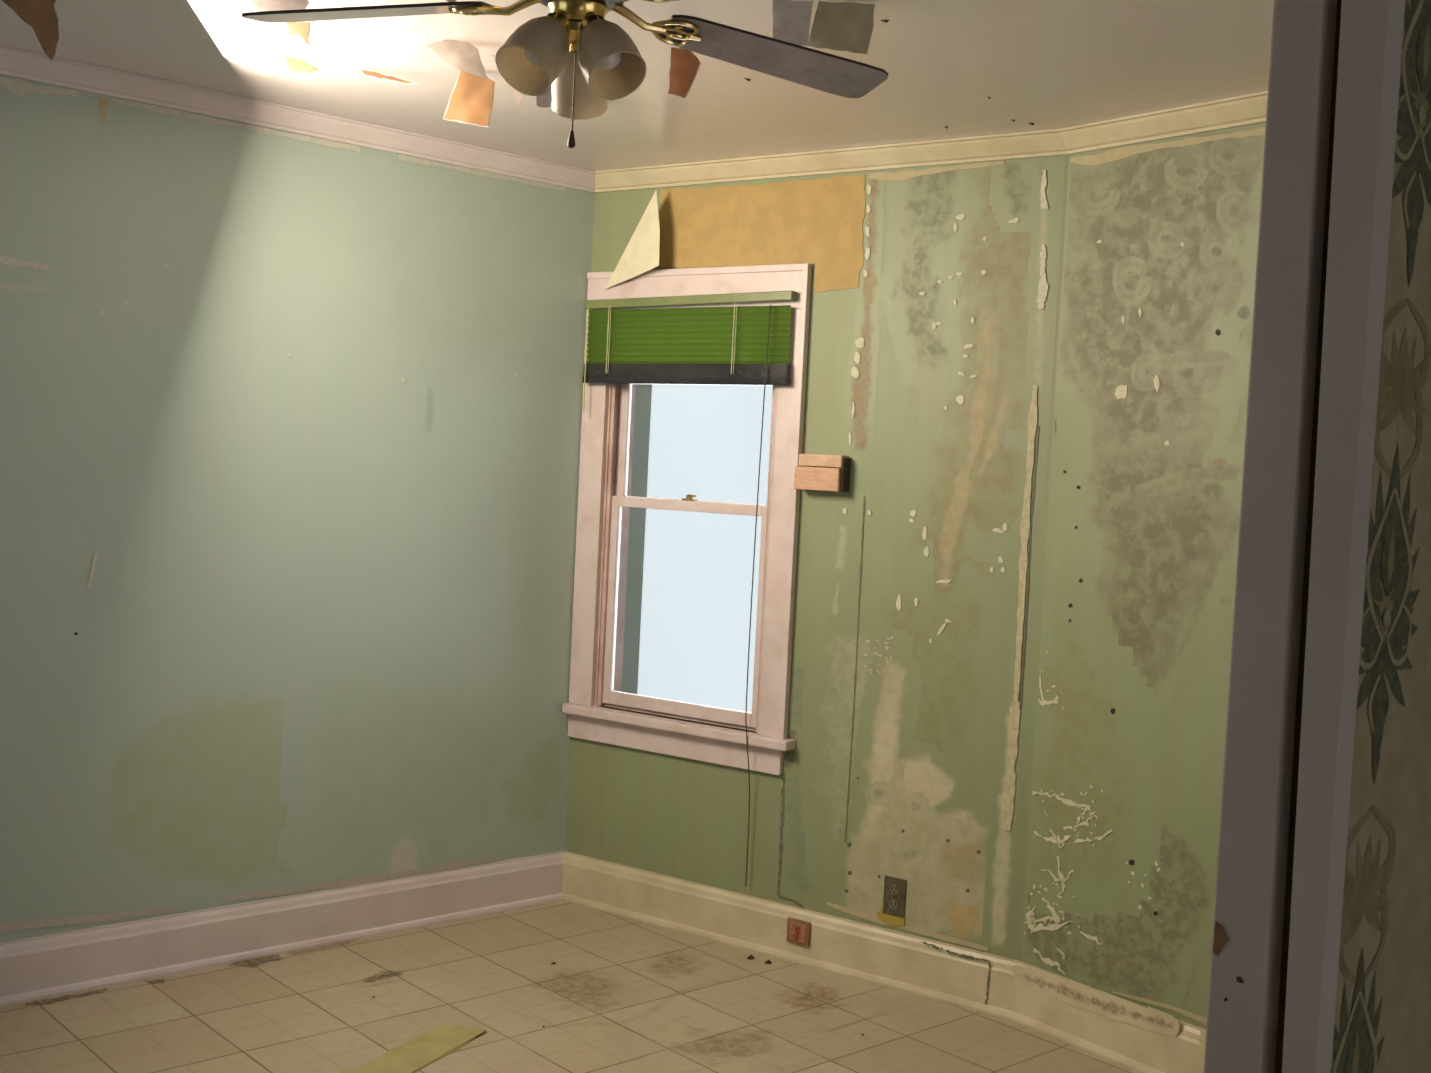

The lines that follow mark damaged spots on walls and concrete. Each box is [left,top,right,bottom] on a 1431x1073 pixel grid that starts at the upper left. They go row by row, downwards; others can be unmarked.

peeling [1,0,61,62]
peeling [245,0,323,74]
peeling [360,68,419,84]
peeling [426,40,525,127]
peeling [659,161,1004,293]
leakage [860,124,1266,773]
peeling [909,510,929,558]
spalling [826,636,989,951]
leakage [1012,762,1217,1037]
peeling [1213,921,1228,956]